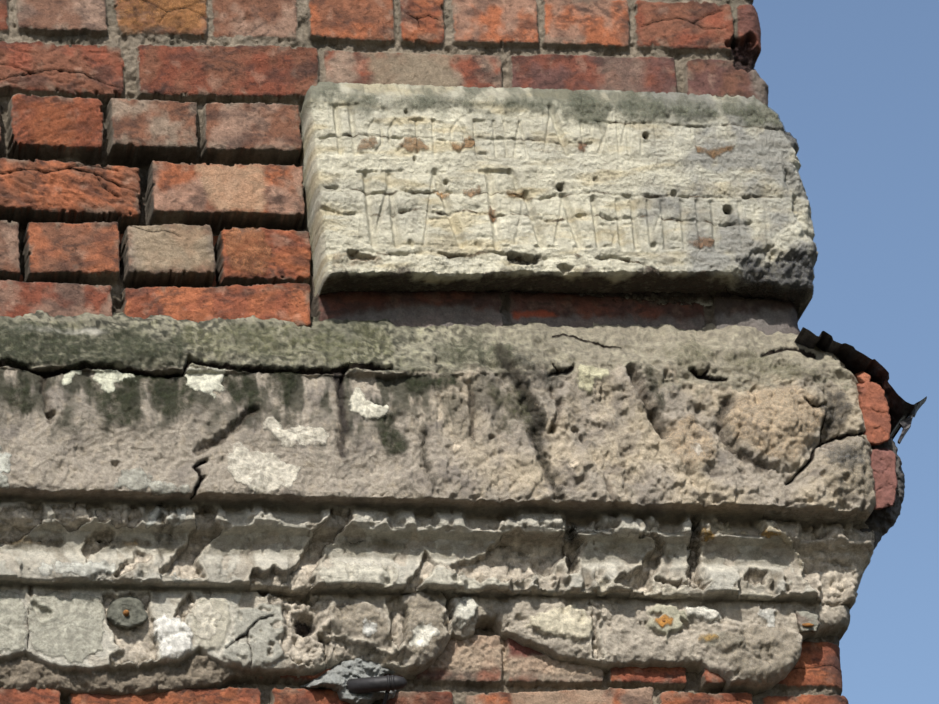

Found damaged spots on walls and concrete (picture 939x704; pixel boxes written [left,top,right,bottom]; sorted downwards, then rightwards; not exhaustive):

leakage [334,373,350,457]
crack [548,363,574,377]
crack [552,333,622,349]
peeling [575,364,610,391]
spalling [628,371,663,439]
crack [762,348,816,358]
crack [786,399,869,485]
flaking render [855,371,898,510]
crack [190,460,206,500]
spalling [0,466,221,585]
spalling [249,509,874,670]
crack [226,616,271,666]